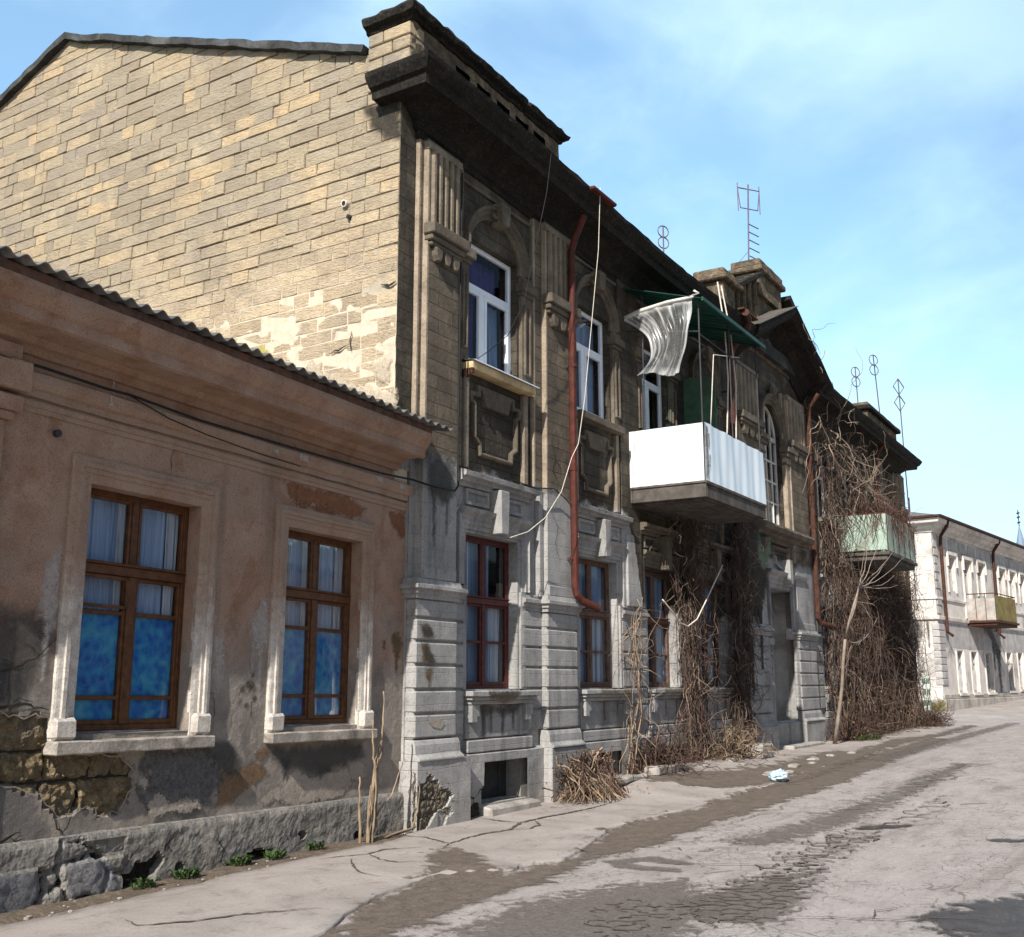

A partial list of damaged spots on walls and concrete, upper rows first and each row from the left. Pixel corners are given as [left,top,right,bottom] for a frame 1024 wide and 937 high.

peeling [284,481,364,520]
flaking render [0,711,269,820]
leakage [205,742,242,774]
flaking render [411,772,453,831]
hole [121,854,157,887]